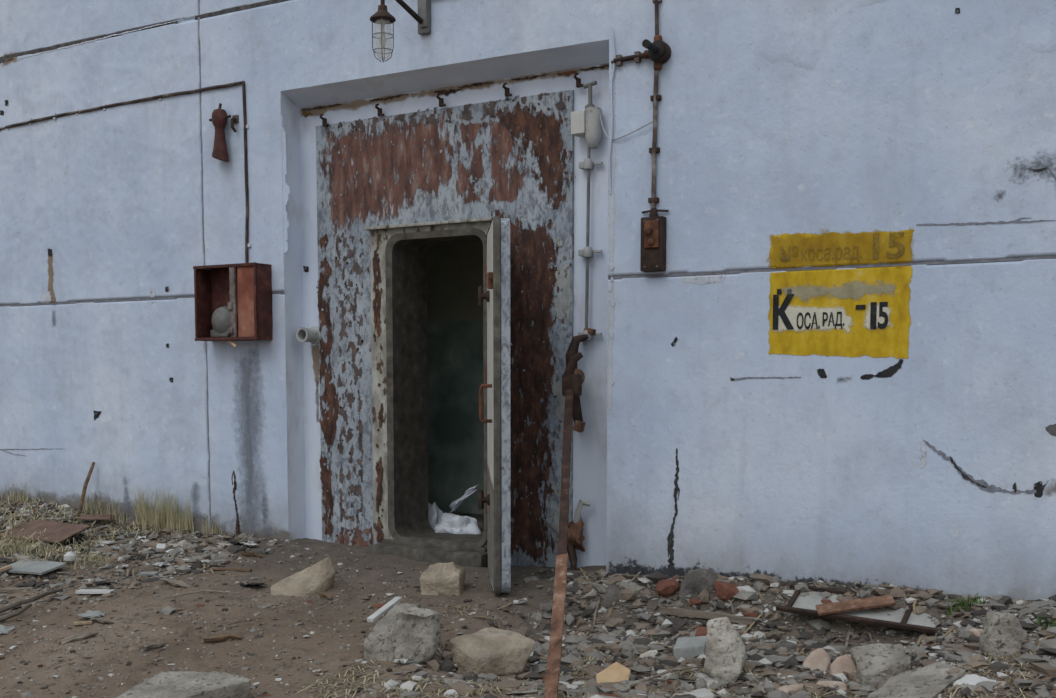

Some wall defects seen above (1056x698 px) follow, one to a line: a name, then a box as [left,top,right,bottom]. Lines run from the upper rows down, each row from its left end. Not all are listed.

rust [42,249,56,325]
peeling [303,92,576,567]
crack [667,448,680,571]
crack [923,440,1049,494]